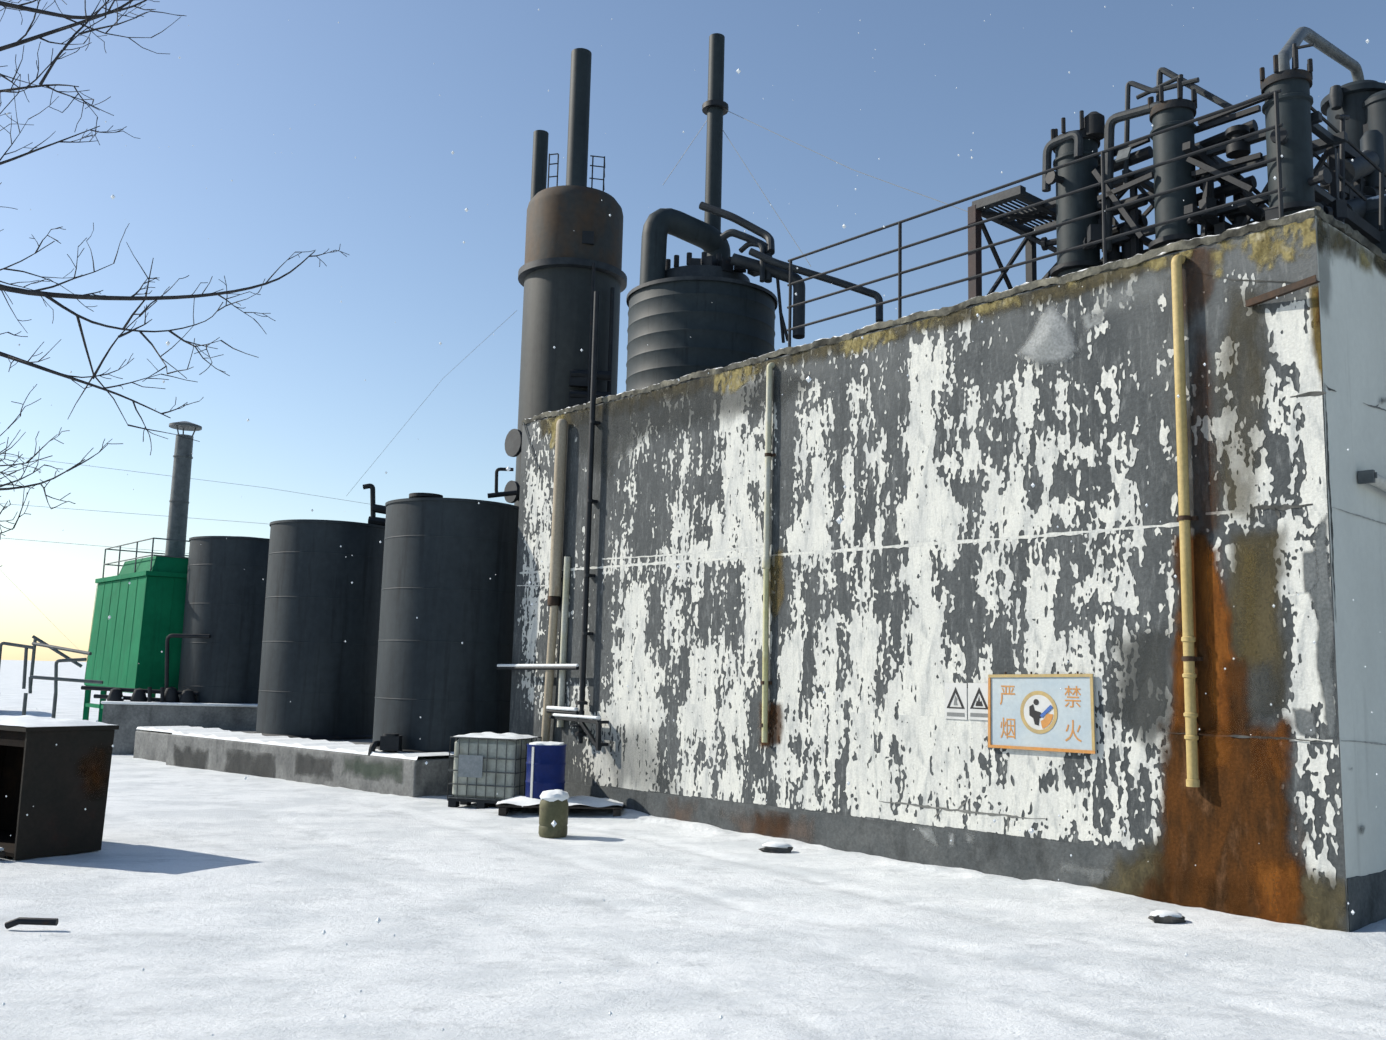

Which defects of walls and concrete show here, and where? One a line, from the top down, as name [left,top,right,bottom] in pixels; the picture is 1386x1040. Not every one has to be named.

leakage [1317,217,1386,273]
peeling [517,267,1189,850]
rust [1102,534,1346,931]
peeling [1159,271,1341,882]